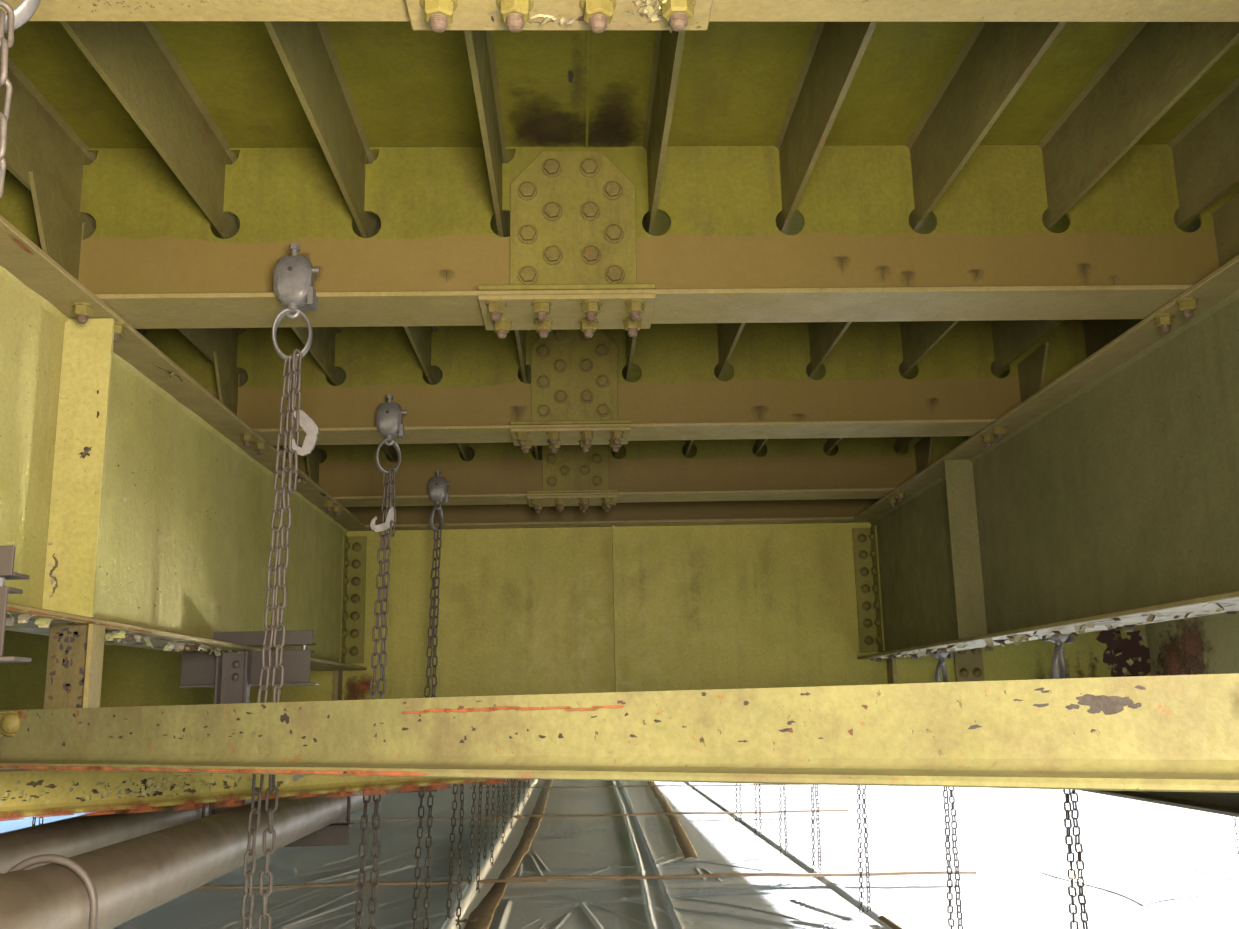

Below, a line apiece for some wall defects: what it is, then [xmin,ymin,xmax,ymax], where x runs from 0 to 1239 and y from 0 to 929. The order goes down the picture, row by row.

peeling [625,0,673,33]
damp [515,93,633,146]
spalling [6,612,87,708]
peeling [104,629,244,656]
peeling [871,600,1239,662]
rust [1066,620,1208,715]
rust [280,707,317,746]
rust [402,700,629,730]
peeling [0,773,252,806]